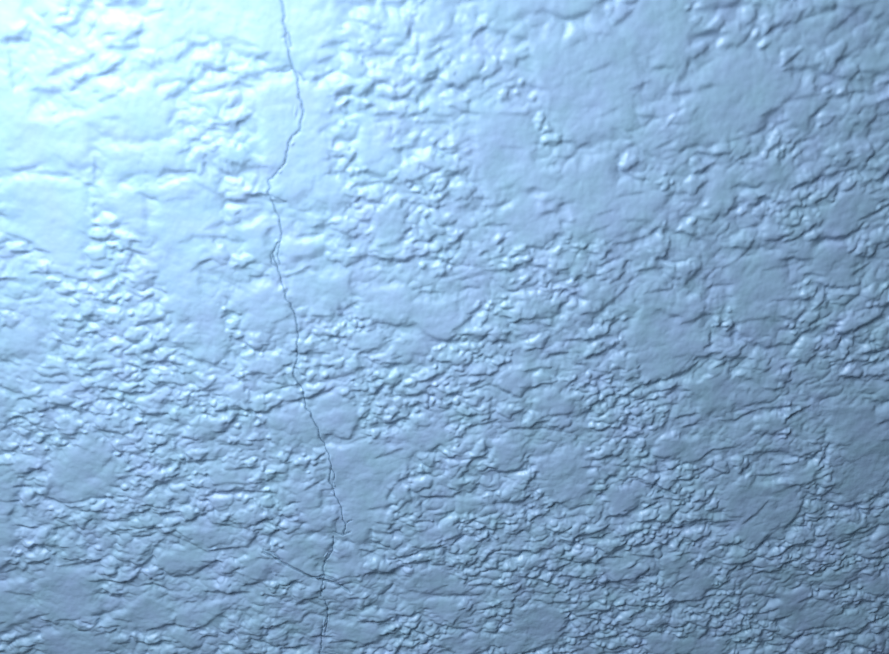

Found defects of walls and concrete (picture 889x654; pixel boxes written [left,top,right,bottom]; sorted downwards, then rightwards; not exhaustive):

crack [248,0,351,654]